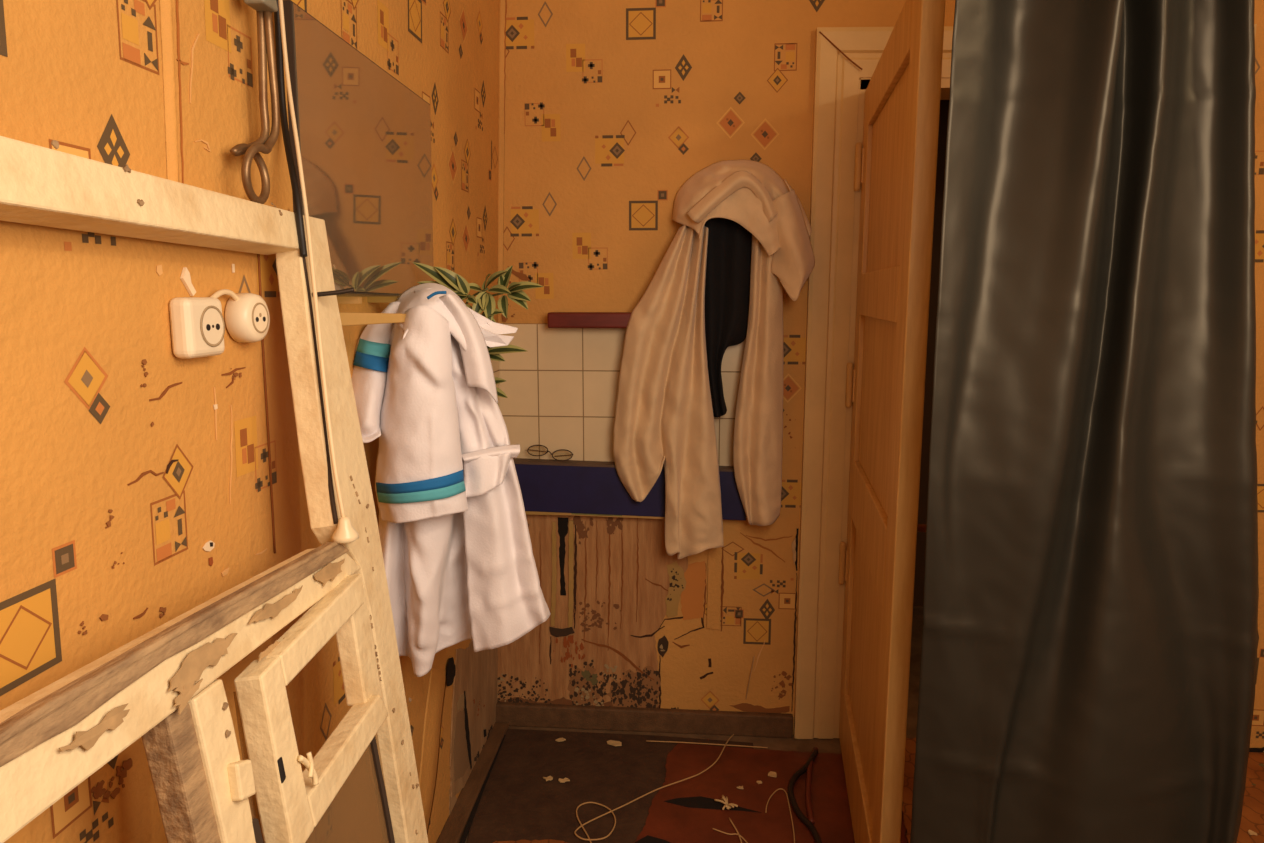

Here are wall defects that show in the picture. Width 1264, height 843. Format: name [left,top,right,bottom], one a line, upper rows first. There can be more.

crack [149,382,182,401]
crack [128,459,179,485]
spalling [549,627,575,637]
damp [497,660,679,709]